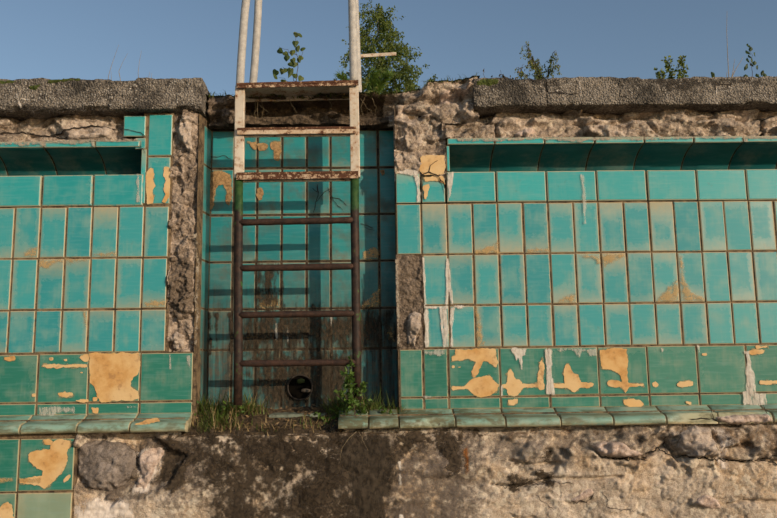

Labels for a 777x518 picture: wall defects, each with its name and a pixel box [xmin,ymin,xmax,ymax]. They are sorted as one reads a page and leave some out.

crack [0,106,145,152]
crack [753,116,774,136]
peeling [146,167,171,205]
peeling [210,170,233,210]
spalling [419,155,446,199]
leakage [193,233,400,408]
spalling [396,255,424,350]
peeling [42,351,141,414]
peeling [450,348,594,406]
peeling [599,347,658,407]
spalling [19,438,164,491]
leakage [74,432,200,518]